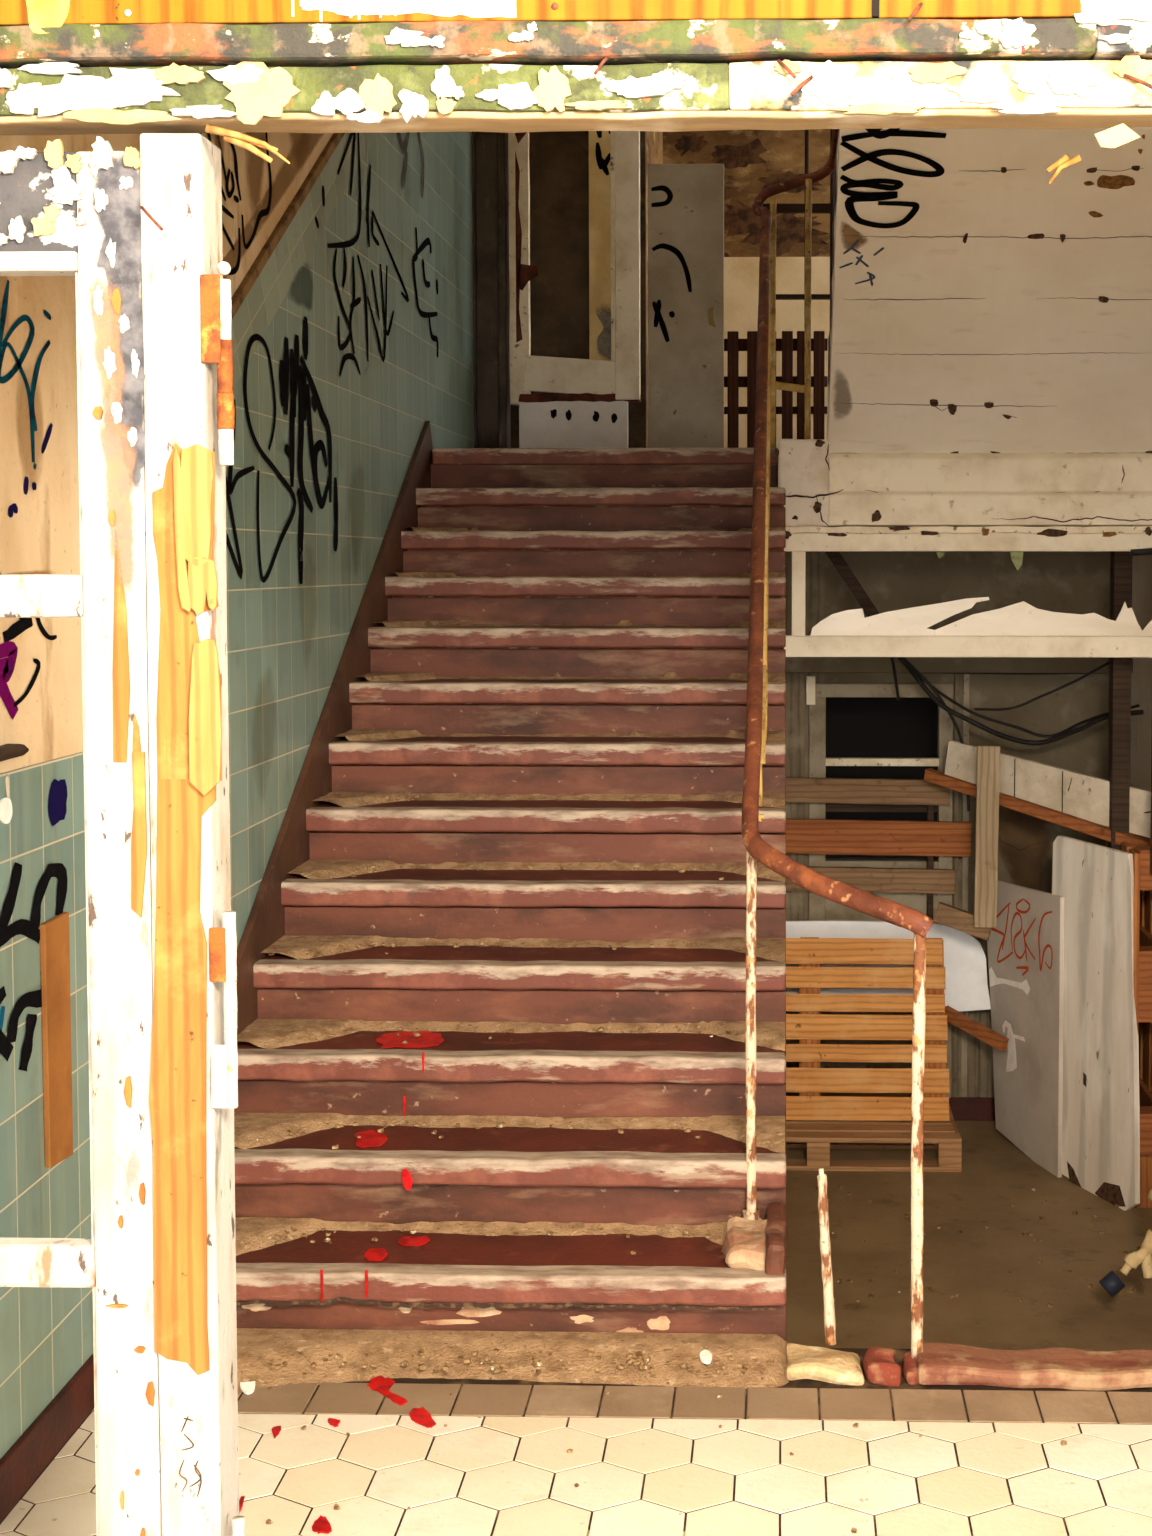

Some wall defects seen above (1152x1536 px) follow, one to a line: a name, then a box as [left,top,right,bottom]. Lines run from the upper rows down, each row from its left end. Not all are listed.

peeling [508,22,538,43]
peeling [774,3,1152,116]
peeling [0,27,687,246]
peeling [1094,123,1145,154]
peeling [111,288,121,315]
peeling [92,406,103,419]
peeling [112,443,222,1375]
peeling [145,1381,155,1407]